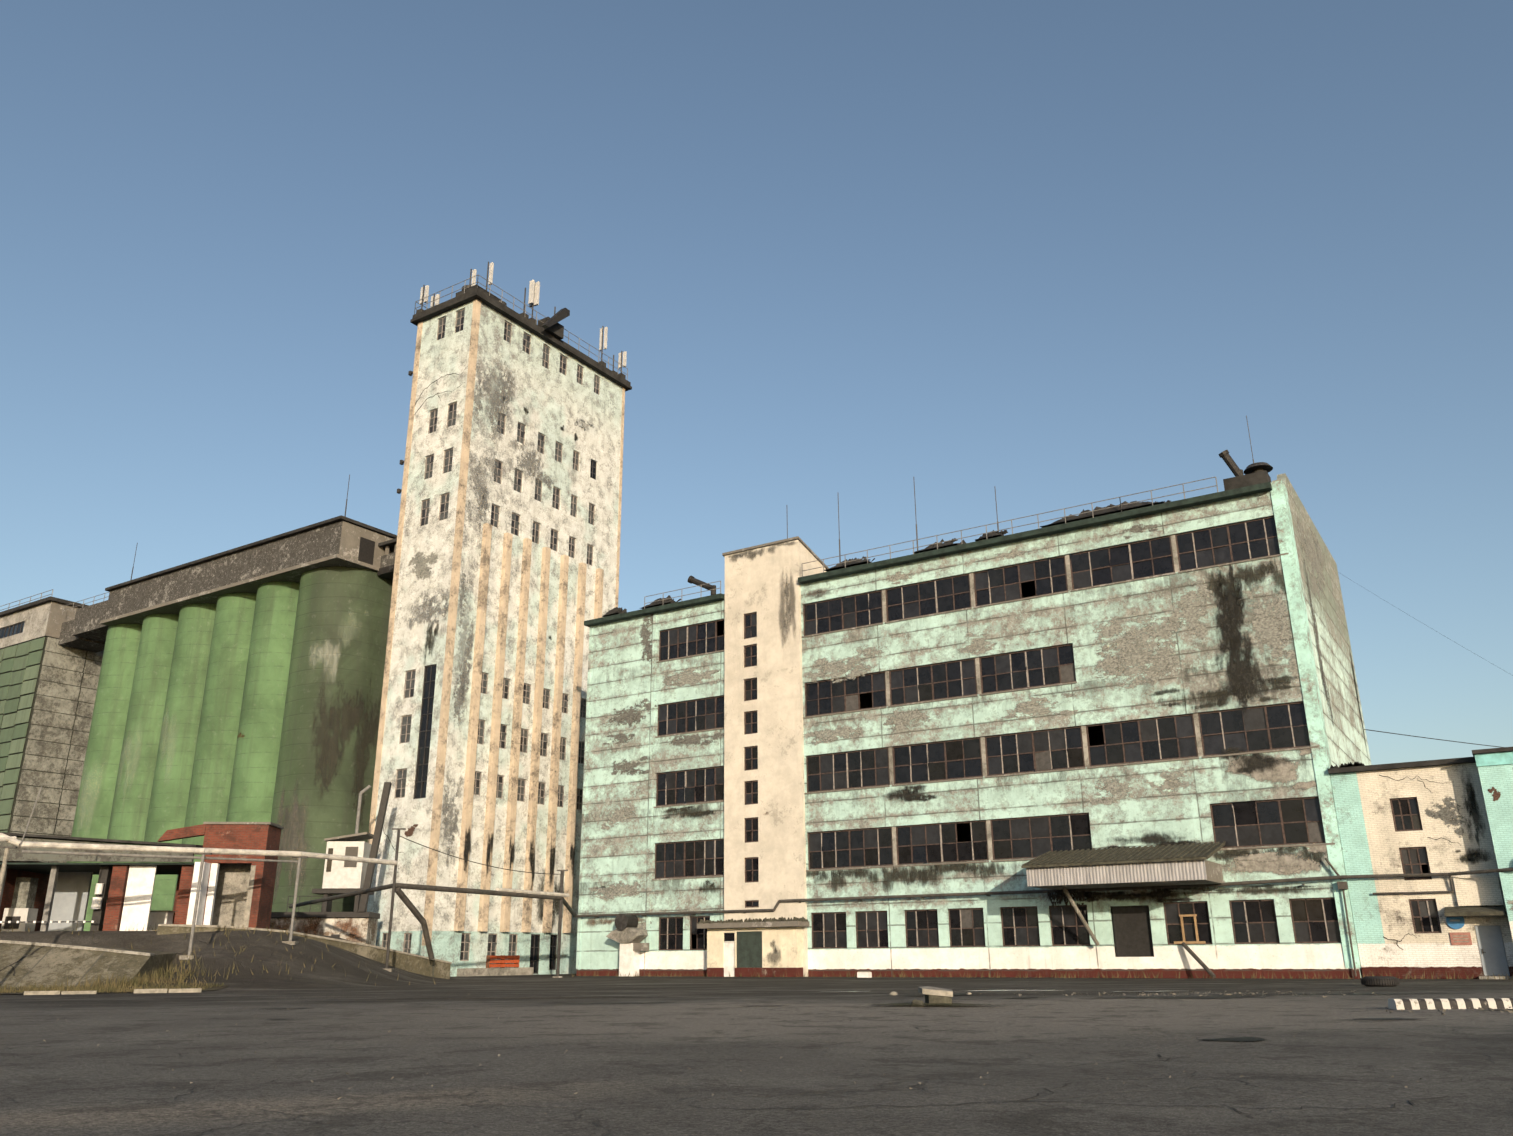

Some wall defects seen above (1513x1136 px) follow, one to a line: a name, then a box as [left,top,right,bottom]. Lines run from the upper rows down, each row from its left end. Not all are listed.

peeling [409,552,438,582]
damp [780,578,823,638]
peeling [1093,581,1212,690]
damp [1154,563,1297,711]
damp [313,682,380,825]
peeling [1425,797,1464,838]